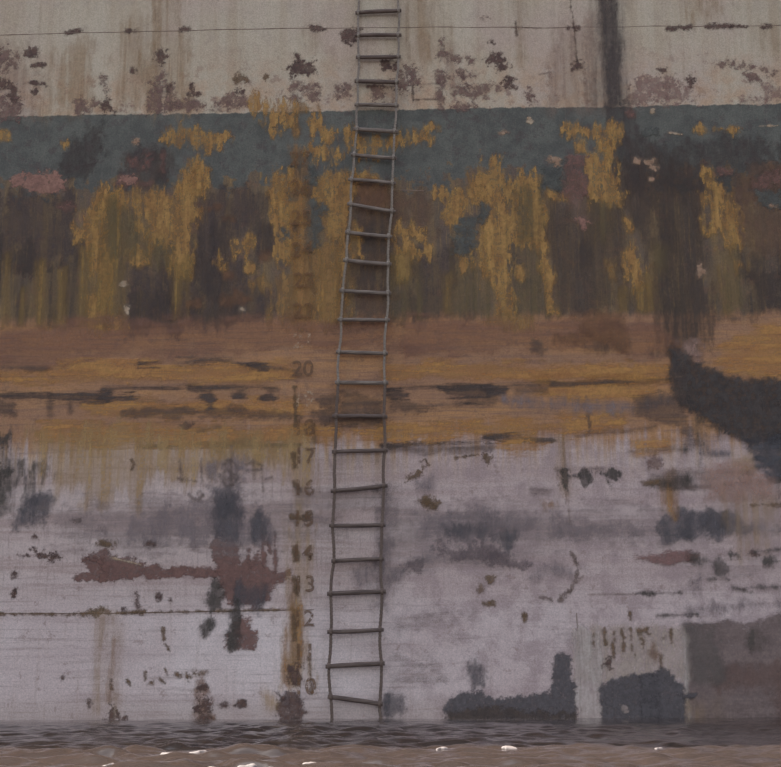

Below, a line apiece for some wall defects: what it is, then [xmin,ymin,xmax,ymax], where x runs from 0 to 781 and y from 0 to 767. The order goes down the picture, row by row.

water stain [600,0,631,121]
rust [0,385,245,429]
rust [312,387,426,427]
rust [431,383,515,404]
water stain [668,348,781,482]
rust [451,432,555,464]
rust [404,459,441,511]
rust [561,468,621,489]
rust [478,575,496,607]
rust [271,575,313,720]